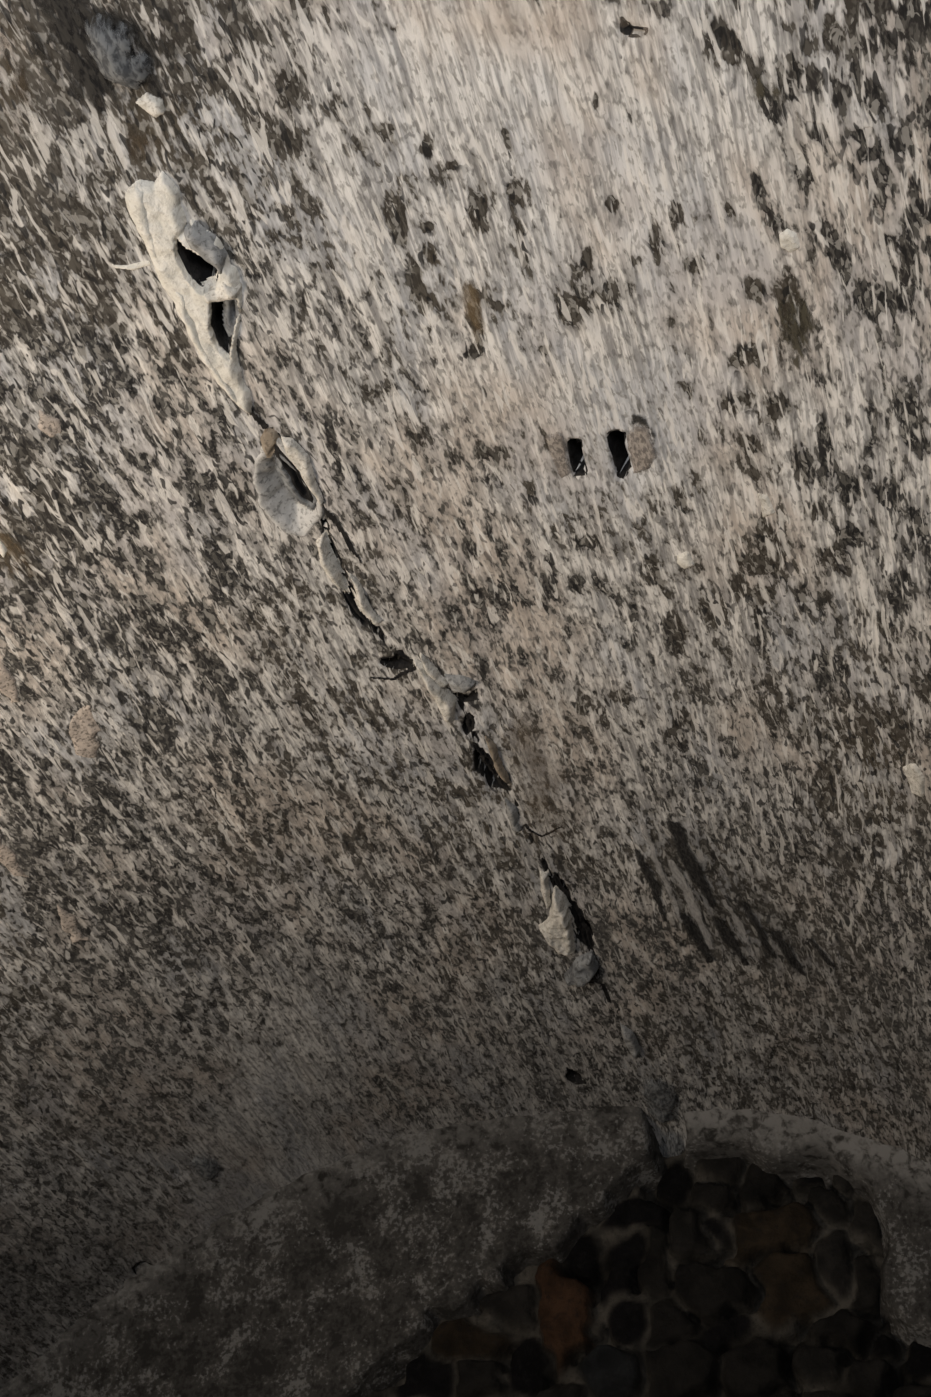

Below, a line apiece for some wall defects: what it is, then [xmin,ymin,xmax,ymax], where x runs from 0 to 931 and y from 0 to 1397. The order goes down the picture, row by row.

flaking render [112,171,252,413]
crack [249,408,282,440]
spalling [627,415,657,474]
crack [294,470,641,1059]